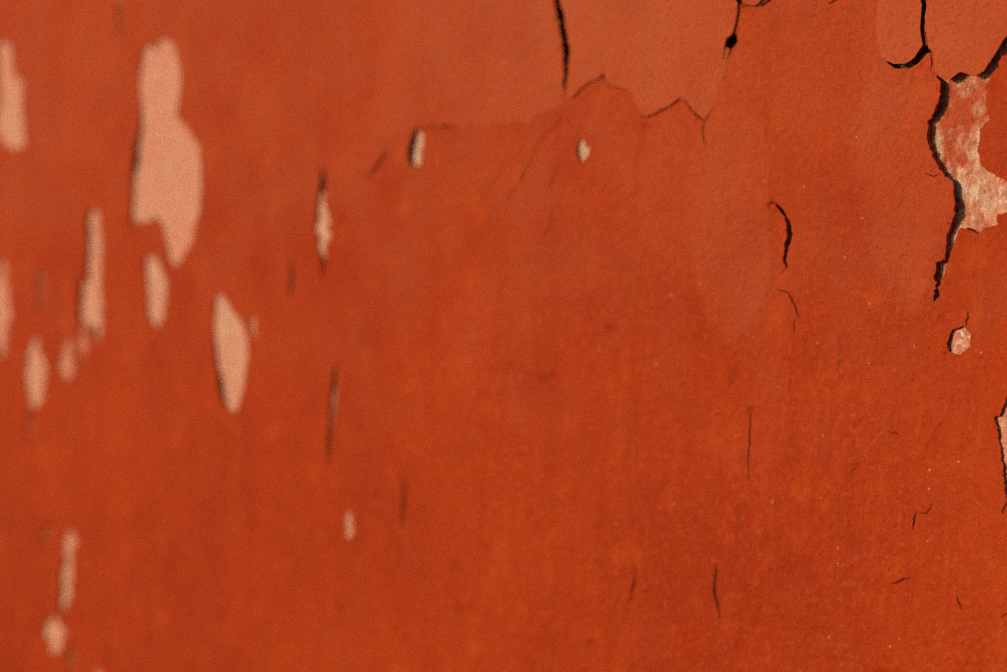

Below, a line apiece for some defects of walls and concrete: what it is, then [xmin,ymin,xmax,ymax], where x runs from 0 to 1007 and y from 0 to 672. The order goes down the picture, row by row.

peeling [0,41,24,150]
peeling [130,39,201,328]
crack [554,0,570,89]
crack [684,99,705,145]
crack [723,33,738,60]
peeling [876,0,1007,302]
peeling [24,210,102,412]
peeling [213,293,256,412]
crack [771,202,800,331]
peeling [994,397,1007,498]